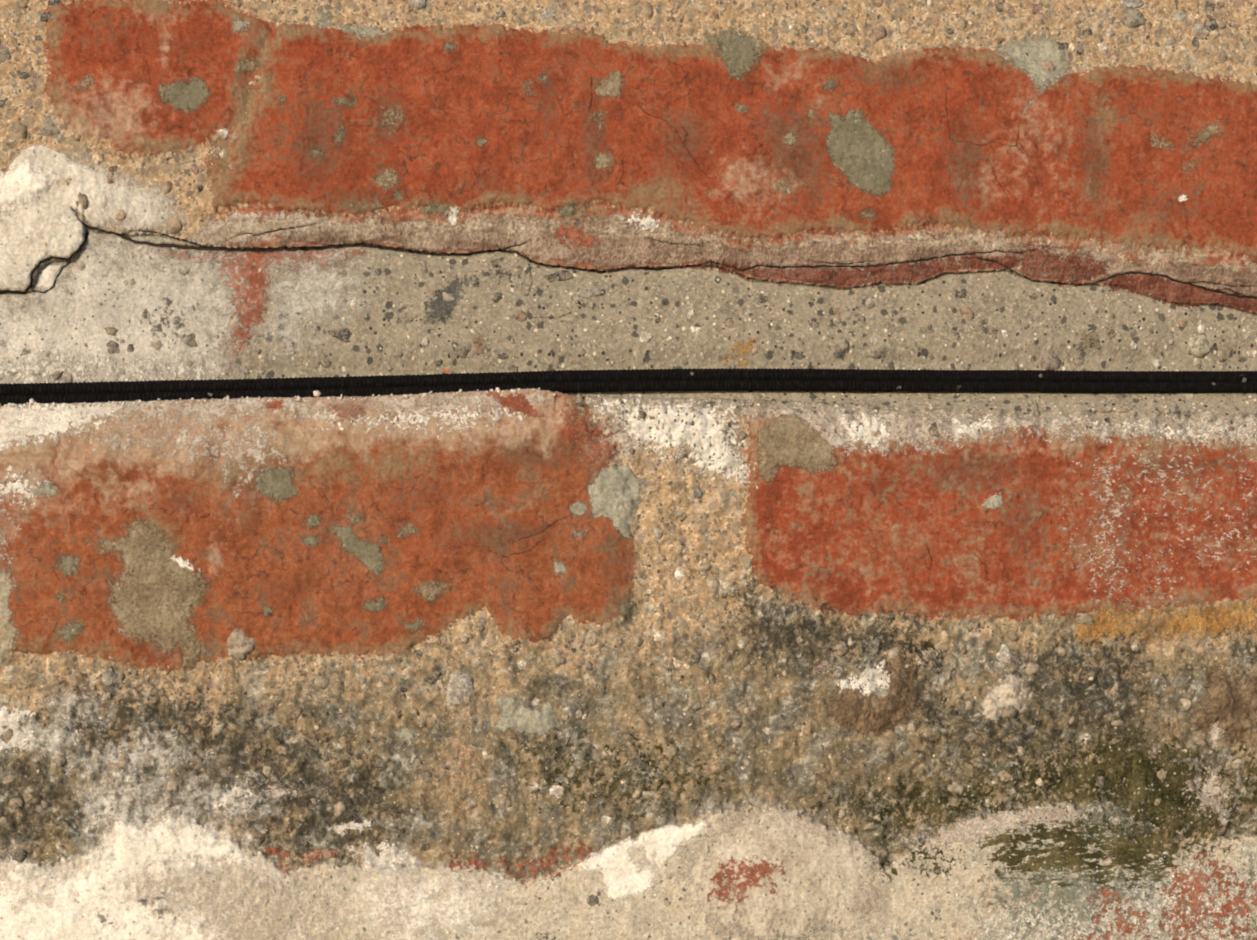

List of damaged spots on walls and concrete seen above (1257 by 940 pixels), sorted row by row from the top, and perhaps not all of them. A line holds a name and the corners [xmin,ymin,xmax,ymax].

crack [0,208,1257,318]
peeling [1182,772,1231,825]
peeling [897,800,1134,851]